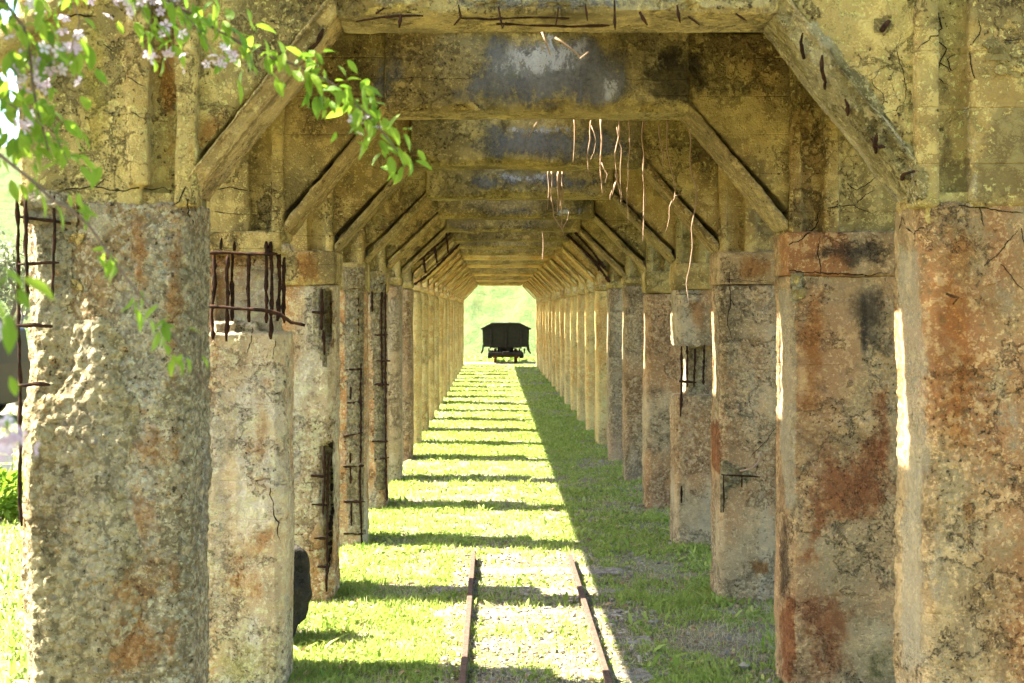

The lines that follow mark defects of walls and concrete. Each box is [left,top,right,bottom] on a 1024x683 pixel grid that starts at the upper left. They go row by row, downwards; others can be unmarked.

leakage [455,34,632,109]
crack [959,204,1024,290]
spalling [14,190,142,683]
spalling [208,238,390,592]
spalling [679,345,707,417]
crack [269,488,281,542]